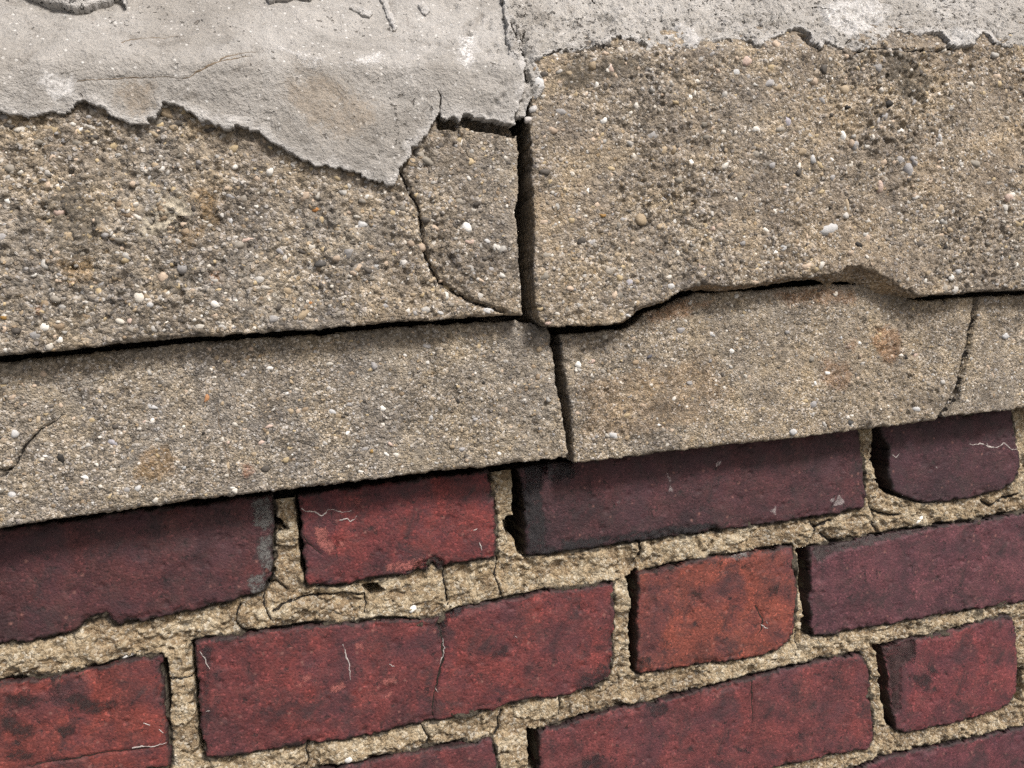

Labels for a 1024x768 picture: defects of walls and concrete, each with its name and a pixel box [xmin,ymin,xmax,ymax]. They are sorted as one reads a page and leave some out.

peeling [0,0,526,186]
crack [399,172,503,313]
spalling [612,265,917,325]
crack [937,300,975,417]
crack [0,415,62,476]
water stain [248,497,273,593]
crack [420,565,449,743]